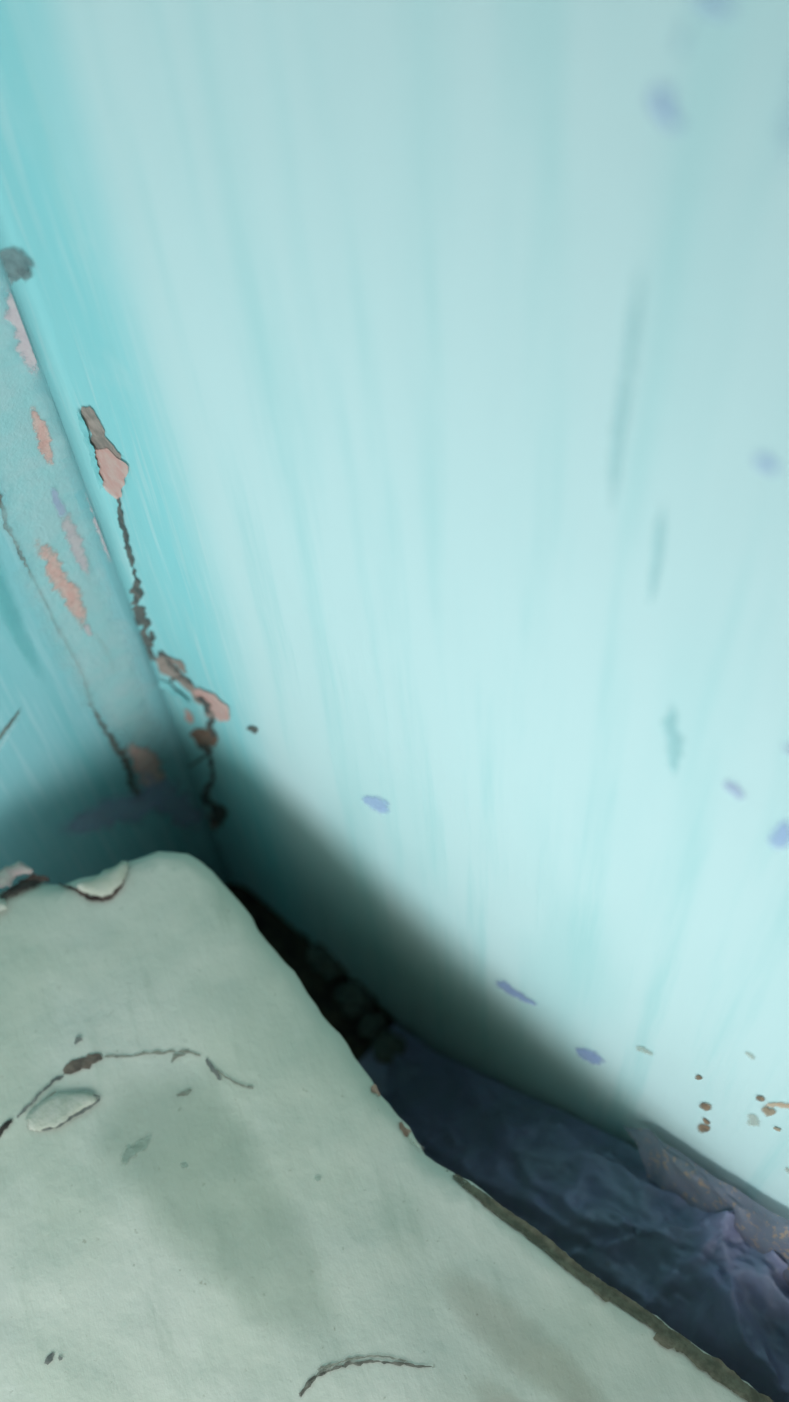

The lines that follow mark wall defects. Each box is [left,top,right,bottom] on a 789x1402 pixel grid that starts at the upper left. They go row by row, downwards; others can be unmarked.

peeling [32,411,53,464]
peeling [77,406,128,499]
peeling [39,505,109,636]
crack [0,494,145,803]
crack [116,498,226,821]
flaking render [155,656,230,756]
peeling [0,861,129,911]
crack [0,1050,253,1137]
corrosion [698,1103,711,1133]
corrosion [756,1096,789,1132]
crack [299,1355,431,1396]